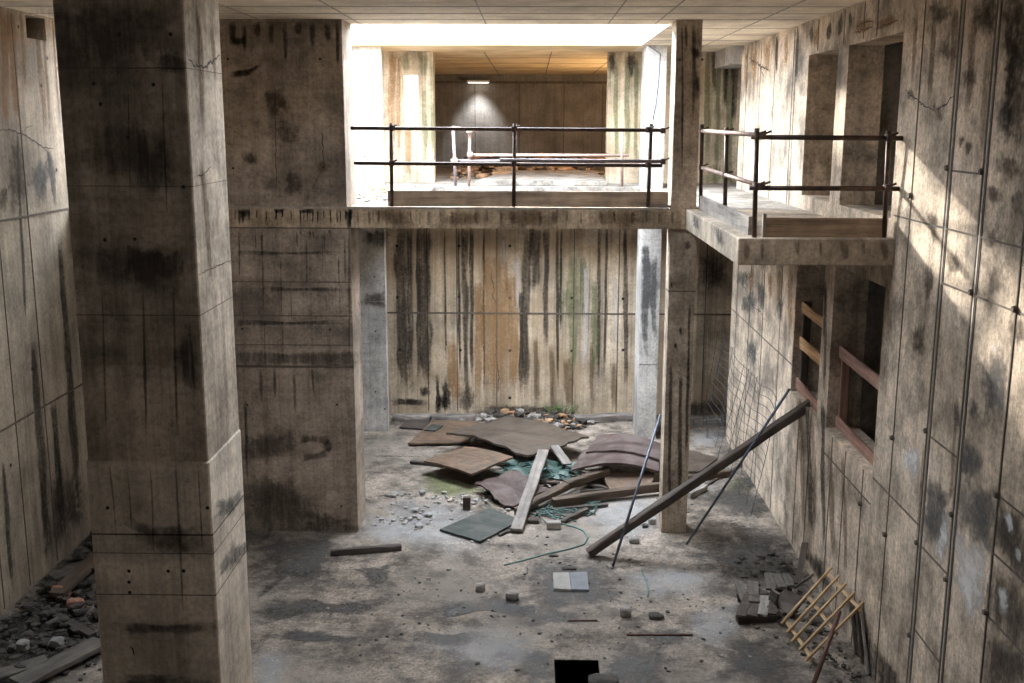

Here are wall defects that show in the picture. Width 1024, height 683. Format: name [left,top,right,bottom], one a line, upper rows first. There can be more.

water stain [229,23,339,63]
water stain [712,54,738,116]
crack [906,90,953,110]
crack [0,126,53,159]
water stain [700,230,724,289]
water stain [365,212,485,409]
water stain [515,214,562,382]
water stain [583,213,636,376]
water stain [484,406,559,414]
water stain [961,441,982,476]
water stain [925,483,1024,573]
water stain [983,579,1024,683]